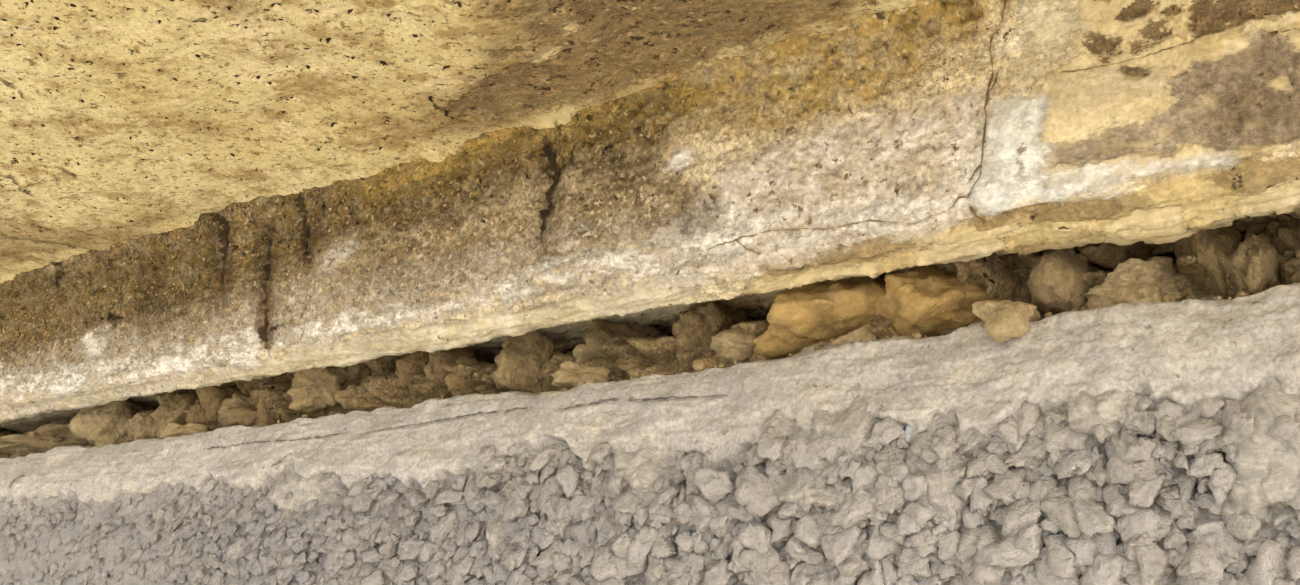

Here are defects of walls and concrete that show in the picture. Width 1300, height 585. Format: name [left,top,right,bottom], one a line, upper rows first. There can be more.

crack [707,0,1007,255]
crack [212,214,229,284]
crack [258,227,284,349]
crack [293,192,308,256]
crack [538,140,560,239]
damp [0,0,1235,421]